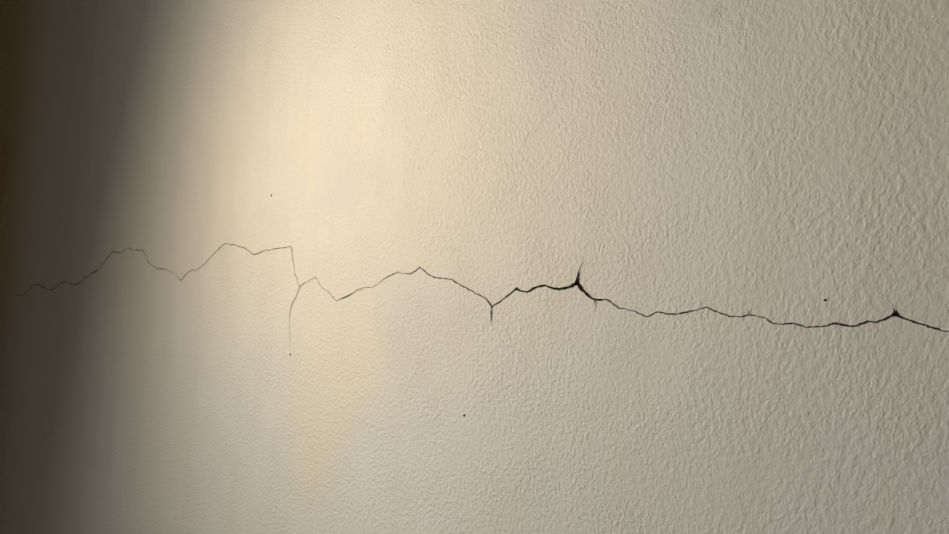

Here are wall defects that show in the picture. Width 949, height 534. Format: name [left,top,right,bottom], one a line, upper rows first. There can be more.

crack [15,243,949,335]